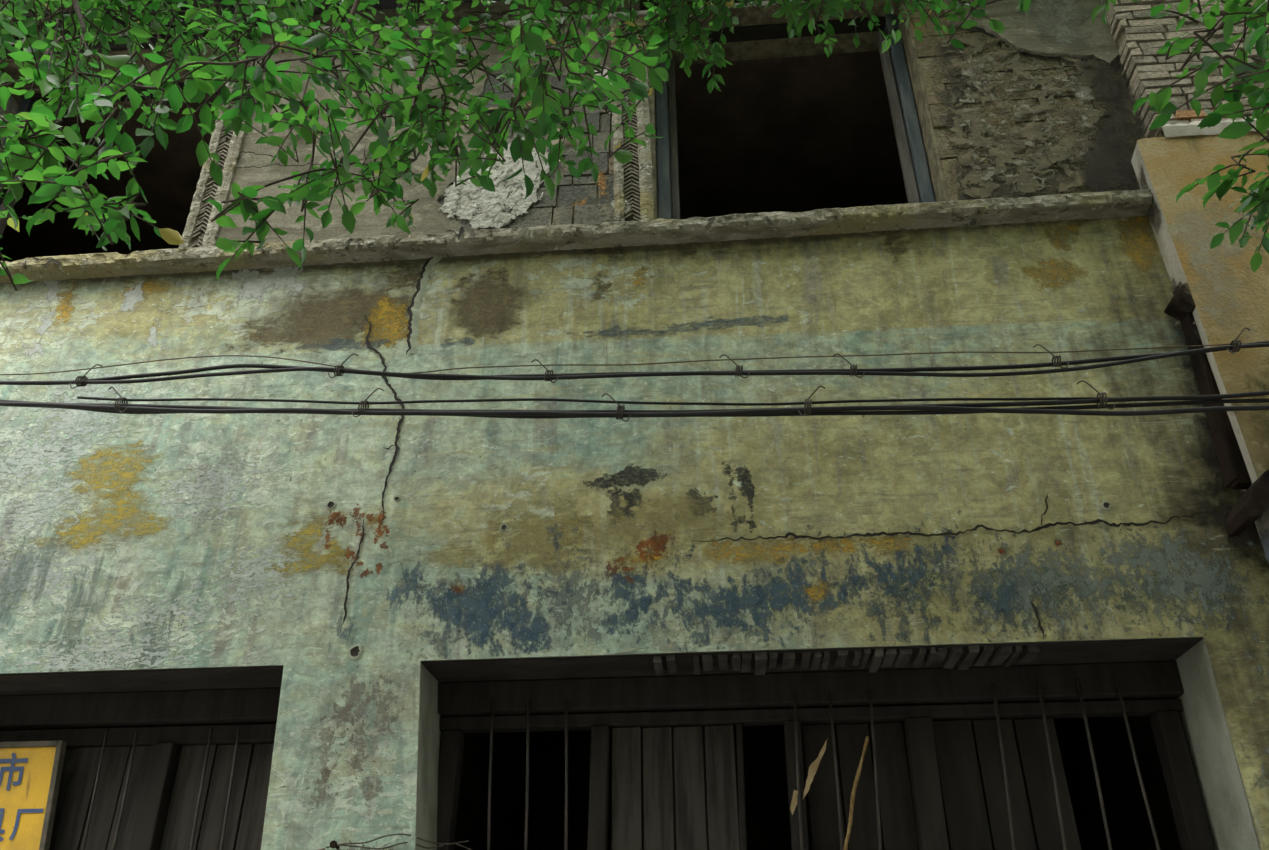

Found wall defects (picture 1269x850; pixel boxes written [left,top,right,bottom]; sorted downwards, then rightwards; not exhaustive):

flaking render [438,65,630,230]
flaking render [940,0,1269,199]
peeling [0,363,312,673]
crack [340,227,465,633]
peeling [384,512,1269,704]
crack [700,493,1233,542]
crack [1030,602,1044,635]